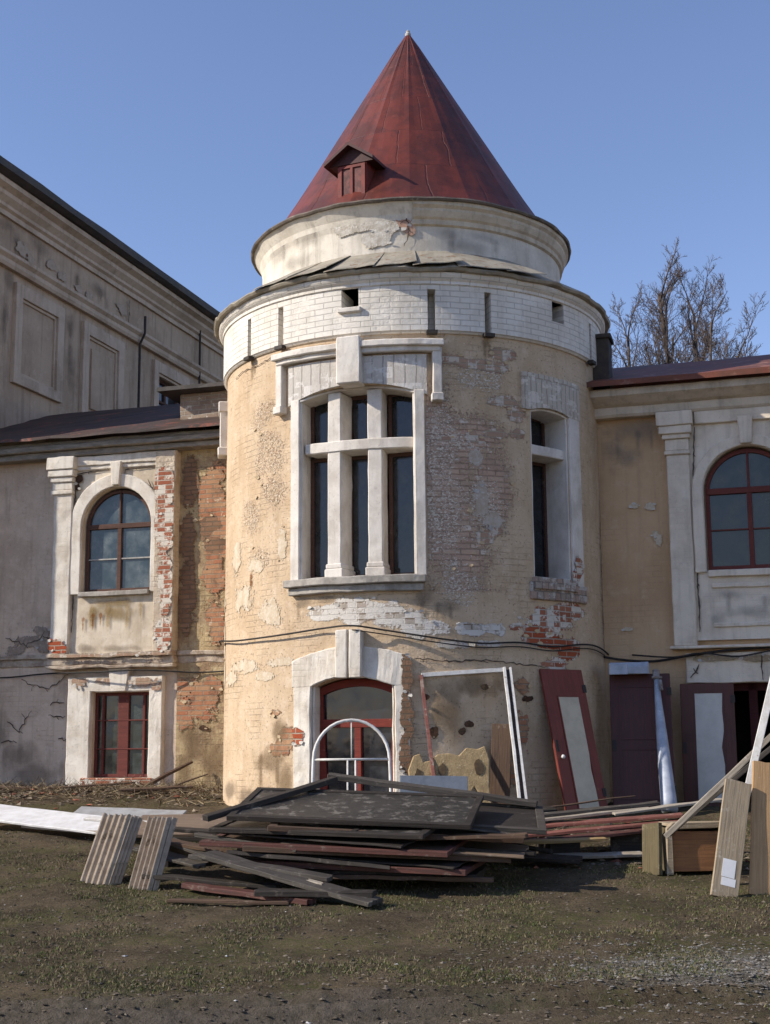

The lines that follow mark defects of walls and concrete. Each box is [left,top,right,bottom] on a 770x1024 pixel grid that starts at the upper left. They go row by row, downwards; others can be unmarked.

peeling [331,217,416,249]
spalling [426,347,529,610]
flaking render [5,395,294,732]
flaking render [306,596,586,670]
crack [1,674,68,743]
spalling [268,709,304,757]
spalling [399,653,414,775]